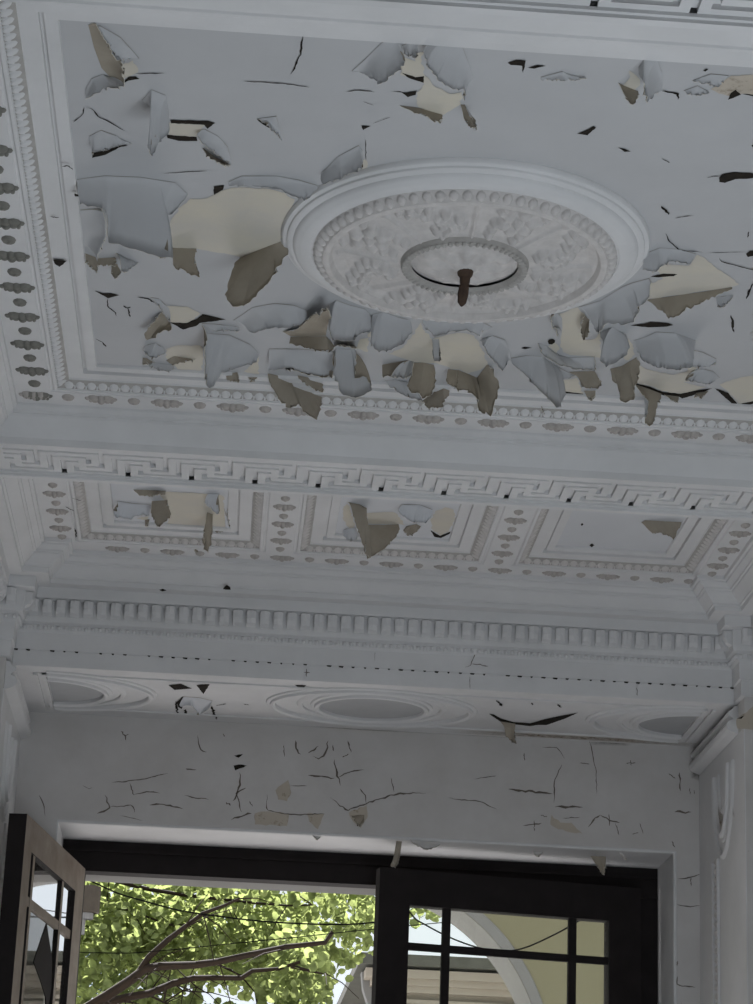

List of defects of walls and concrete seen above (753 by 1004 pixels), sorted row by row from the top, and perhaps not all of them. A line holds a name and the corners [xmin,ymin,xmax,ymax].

peeling [74,23,162,158]
peeling [348,42,478,131]
peeling [618,60,753,105]
peeling [142,90,232,168]
peeling [77,116,753,426]
peeling [113,490,230,553]
peeling [342,502,456,559]
peeling [490,700,576,744]
crack [84,734,253,820]
crack [283,740,425,811]
crack [452,741,597,809]
crack [669,772,695,814]